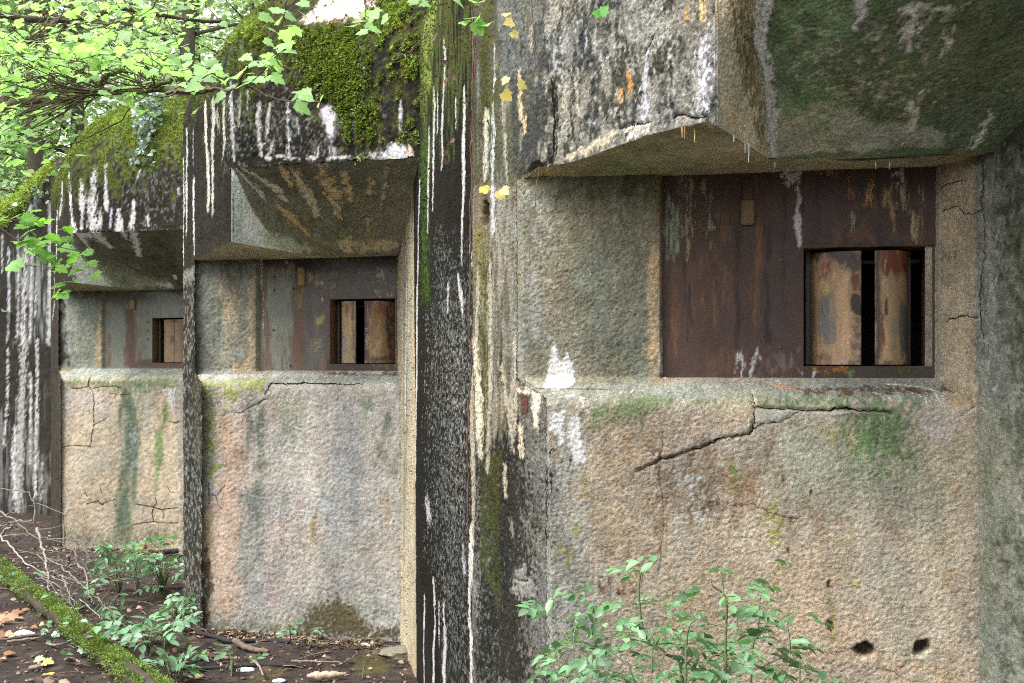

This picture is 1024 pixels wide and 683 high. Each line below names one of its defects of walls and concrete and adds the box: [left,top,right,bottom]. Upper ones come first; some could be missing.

water stain [178,82,392,265]
corrosion [662,175,724,262]
corrosion [848,179,924,244]
water stain [1,165,149,513]
crack [65,377,129,447]
water stain [163,387,176,413]
crack [223,380,364,416]
water stain [404,40,589,683]
corrosion [812,366,855,378]
crack [85,486,178,525]
crack [635,401,890,573]